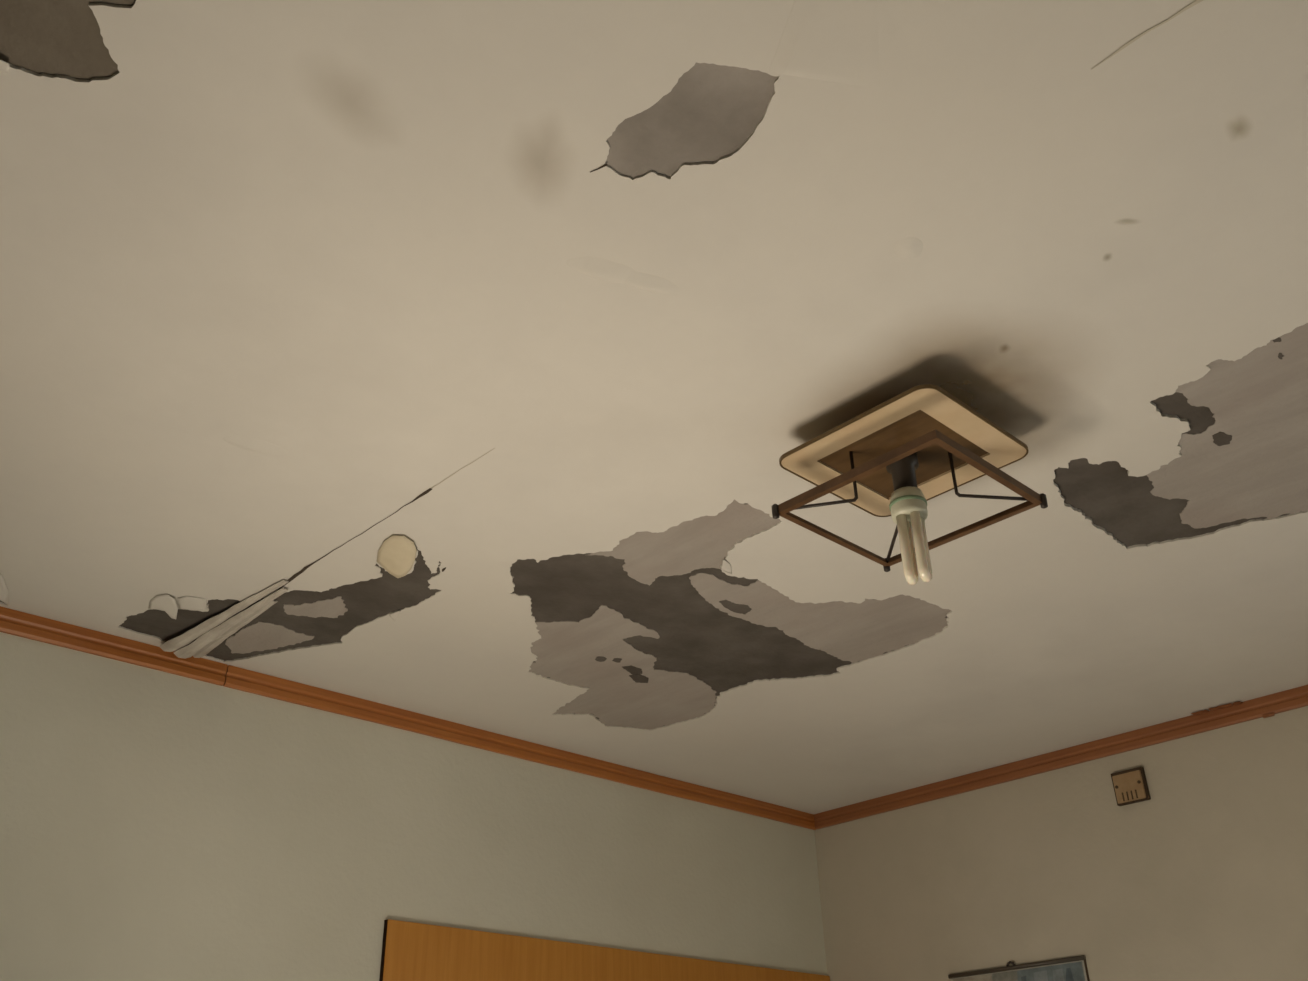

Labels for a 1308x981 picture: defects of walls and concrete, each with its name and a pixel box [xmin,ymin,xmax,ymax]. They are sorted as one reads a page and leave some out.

peeling [0,0,136,80]
crack [1092,0,1203,69]
peeling [605,62,778,178]
peeling [1053,323,1308,547]
crack [278,448,495,590]
peeling [119,535,441,661]
peeling [510,499,951,730]